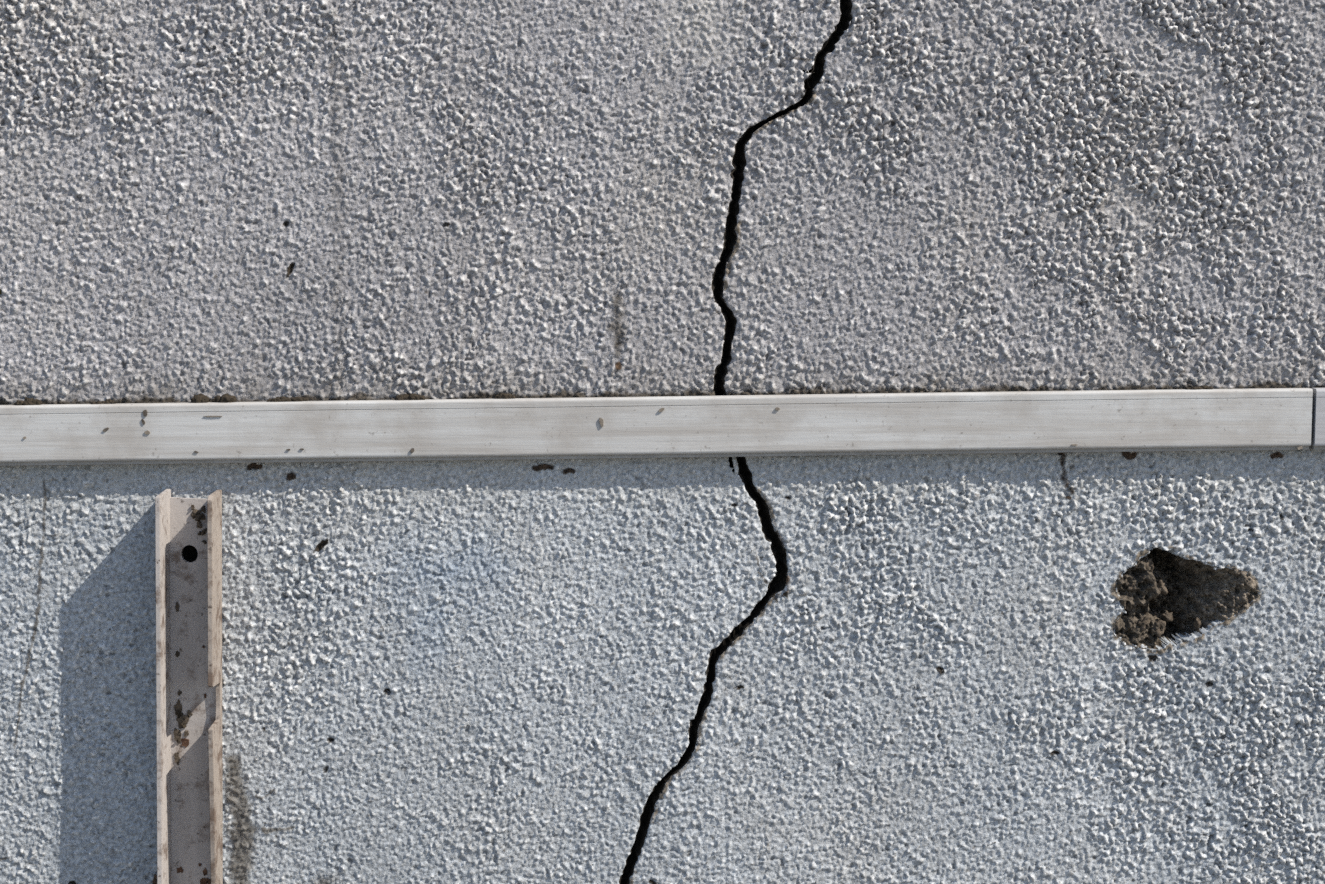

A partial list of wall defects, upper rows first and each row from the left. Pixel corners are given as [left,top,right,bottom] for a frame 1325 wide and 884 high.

crack [712,0,852,396]
crack [619,457,790,884]
spalling [1111,546,1261,662]